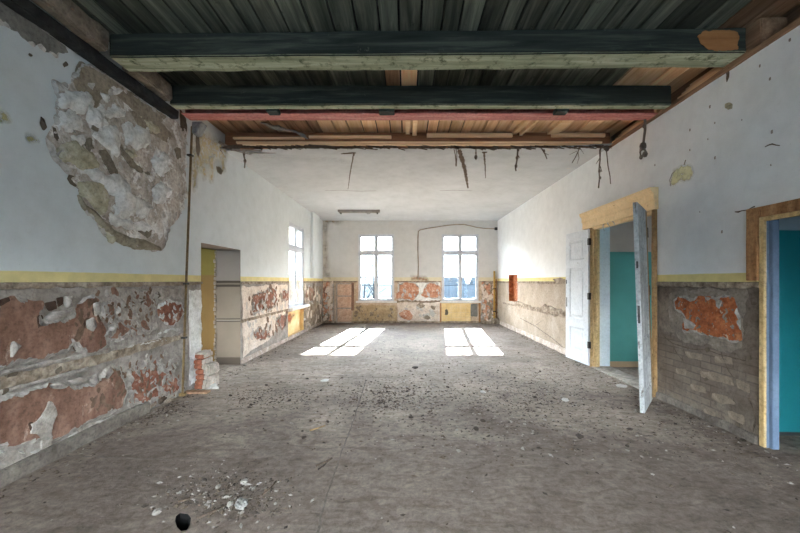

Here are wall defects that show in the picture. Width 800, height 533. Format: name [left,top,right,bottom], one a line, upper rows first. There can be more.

flaking render [0,2,188,252]
flaking render [242,283,289,358]
flaking render [353,282,441,321]
spalling [513,301,566,317]
spalling [673,294,742,343]
peeling [0,286,193,470]